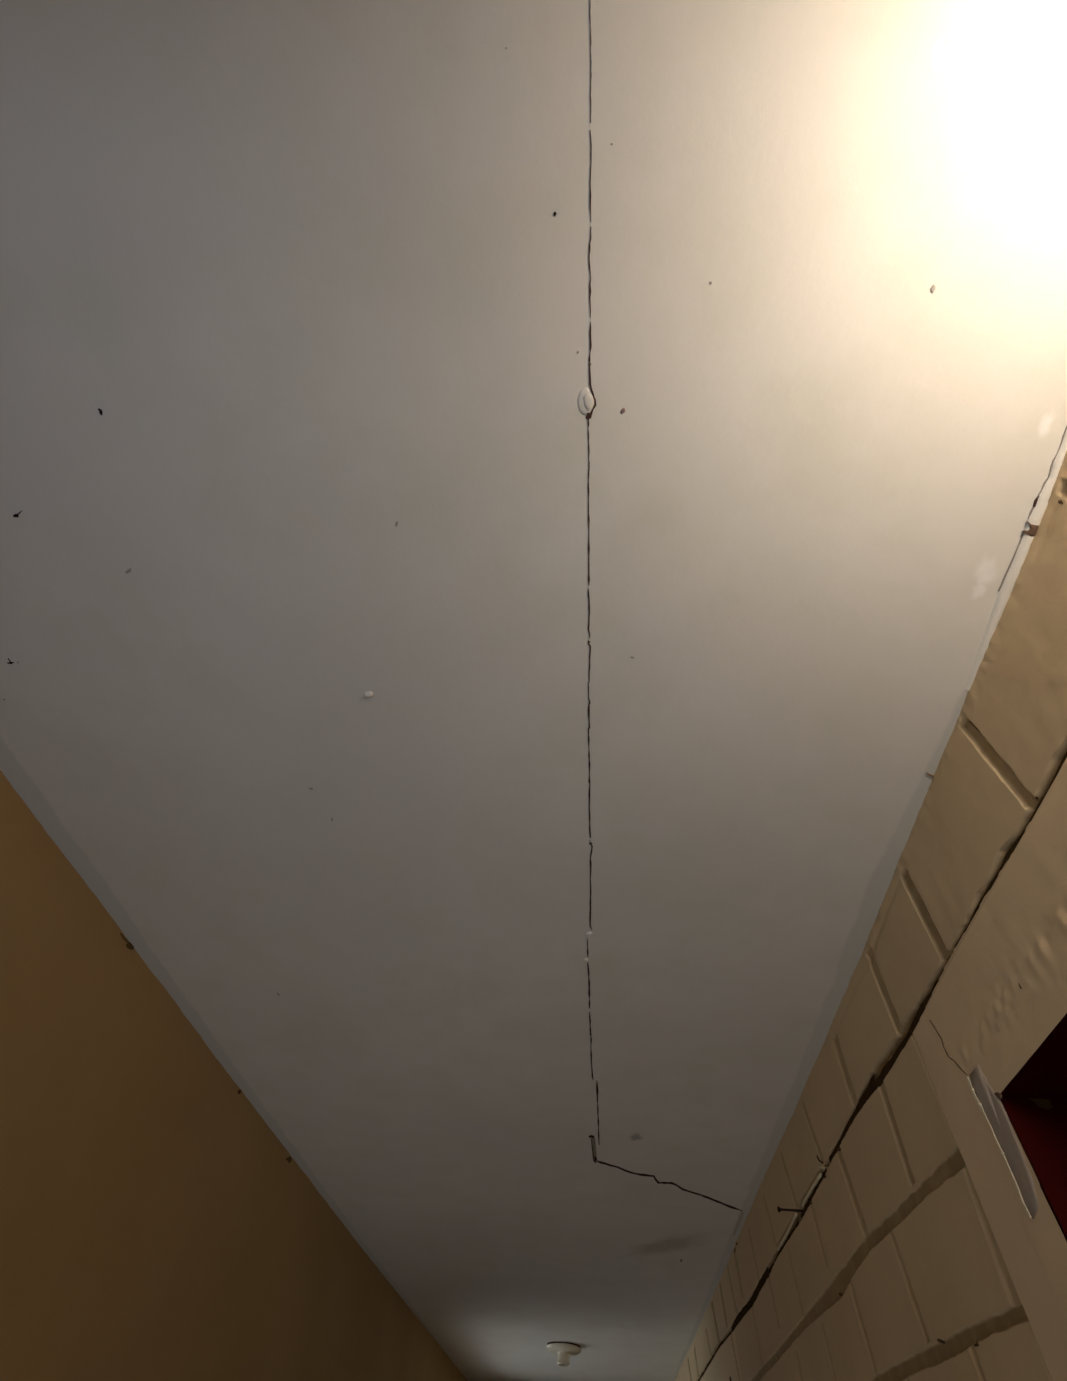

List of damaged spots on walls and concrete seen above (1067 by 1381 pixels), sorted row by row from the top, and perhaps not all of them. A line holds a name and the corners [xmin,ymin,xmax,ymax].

crack [583,4,745,1236]
crack [998,426,1067,592]
crack [698,752,1067,1381]